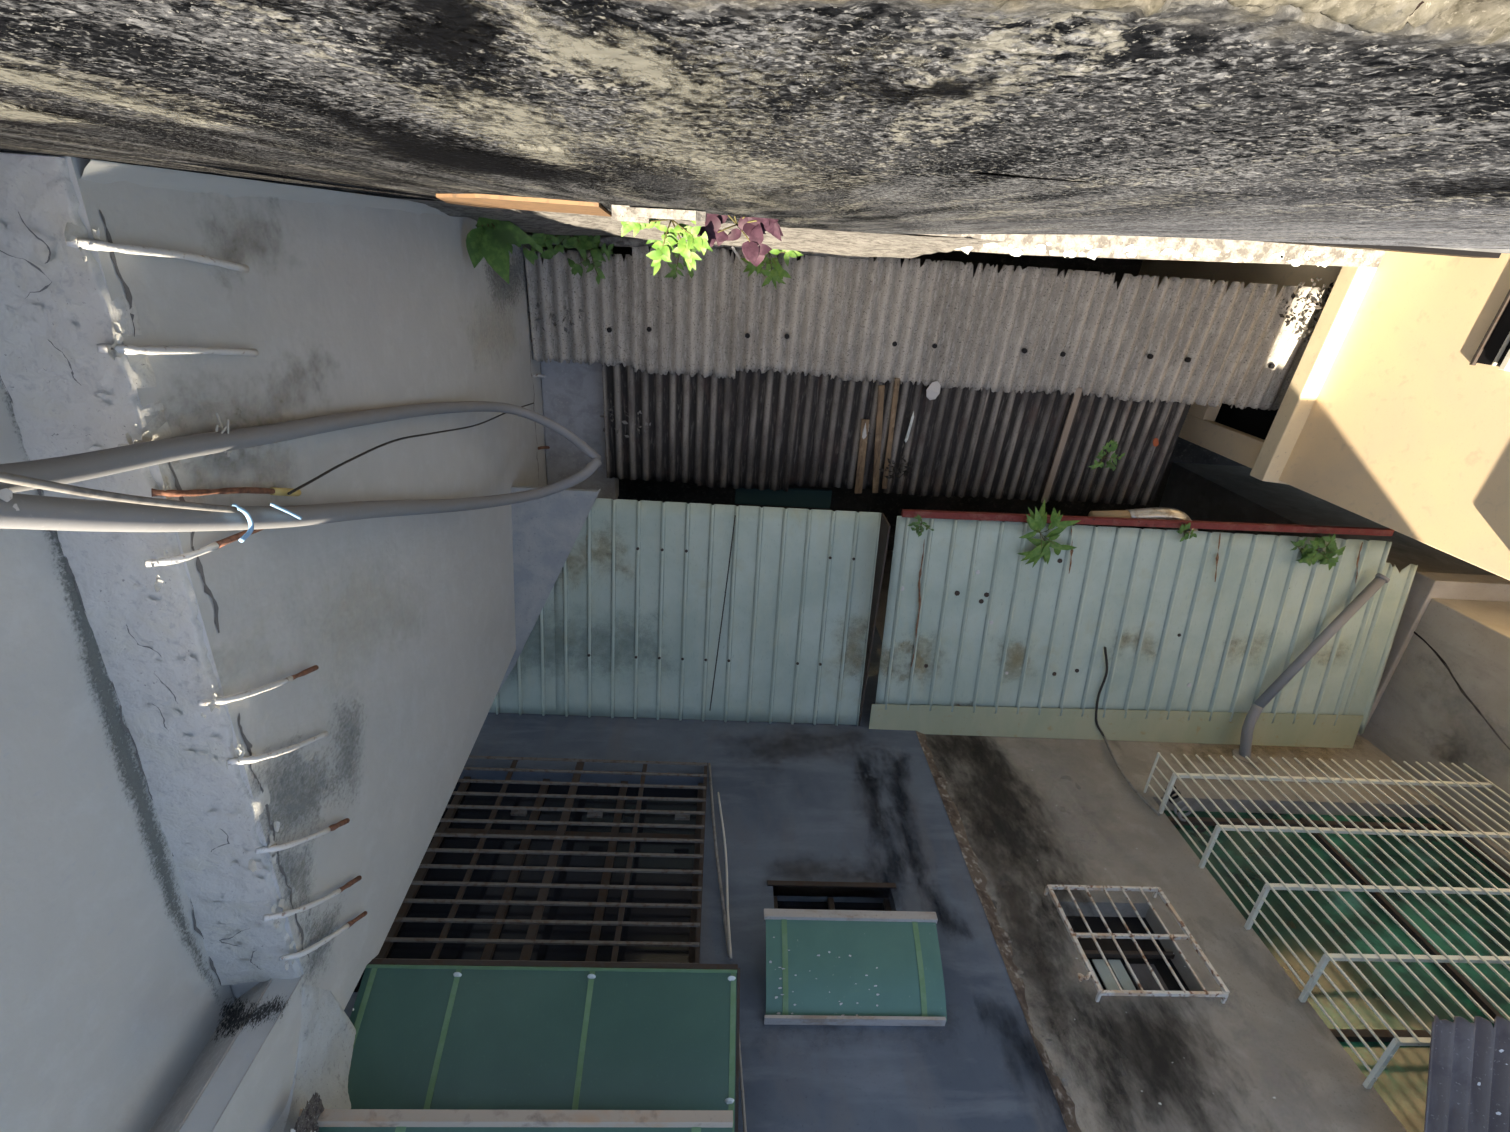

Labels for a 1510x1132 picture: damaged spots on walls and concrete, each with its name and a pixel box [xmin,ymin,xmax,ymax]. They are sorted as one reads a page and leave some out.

water stain [167,0,312,14]
water stain [358,0,513,92]
water stain [838,76,995,110]
water stain [258,87,637,186]
water stain [1367,171,1510,200]
peeling [0,488,20,511]
spalling [144,529,264,592]
spalling [197,665,319,719]
spalling [226,731,329,770]
spalling [248,818,350,872]
spalling [263,875,362,929]
spalling [279,911,367,970]